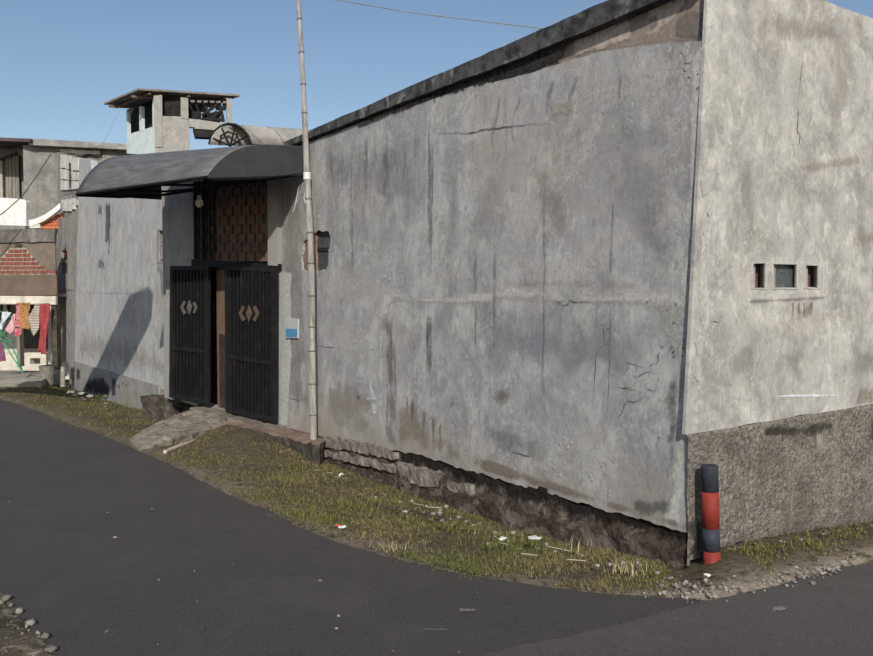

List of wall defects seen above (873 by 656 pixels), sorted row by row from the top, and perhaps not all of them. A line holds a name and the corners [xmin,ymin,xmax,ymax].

crack [446,123,536,134]
flaking render [303,200,323,271]
damp [378,322,457,455]
crack [543,296,660,416]